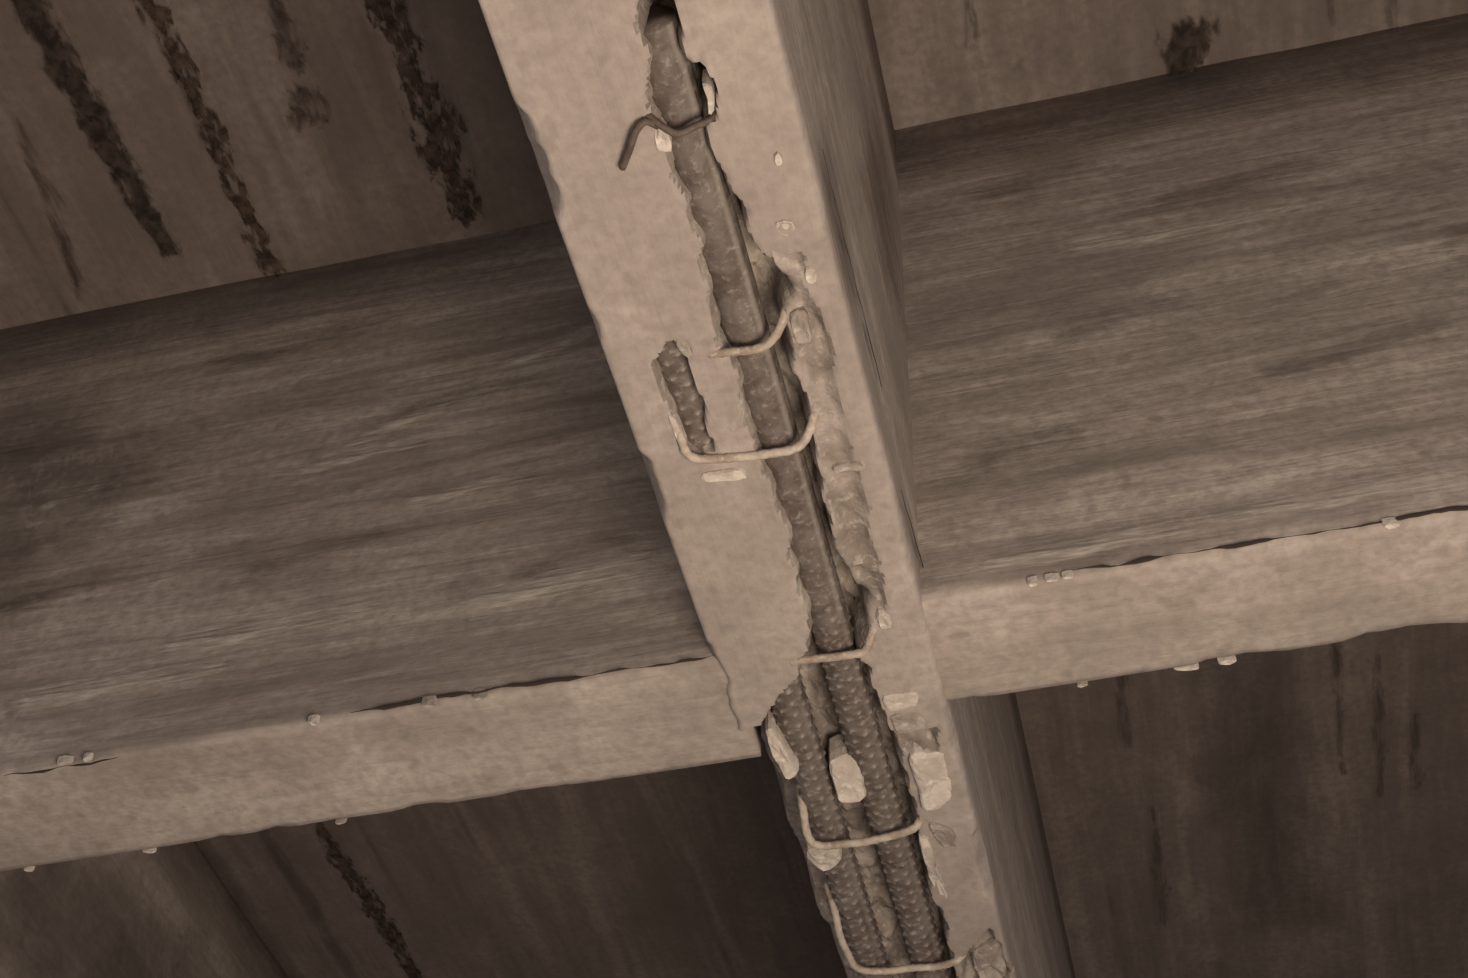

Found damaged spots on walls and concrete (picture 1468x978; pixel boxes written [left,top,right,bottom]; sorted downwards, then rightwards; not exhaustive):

leakage [12,0,178,258]
leakage [133,0,287,277]
leakage [271,0,328,125]
leakage [365,0,484,228]
mould [1161,17,1218,77]
spalling [633,0,1014,978]
spalling [1027,570,1073,587]
spalling [1381,517,1400,529]
leakage [316,822,422,978]